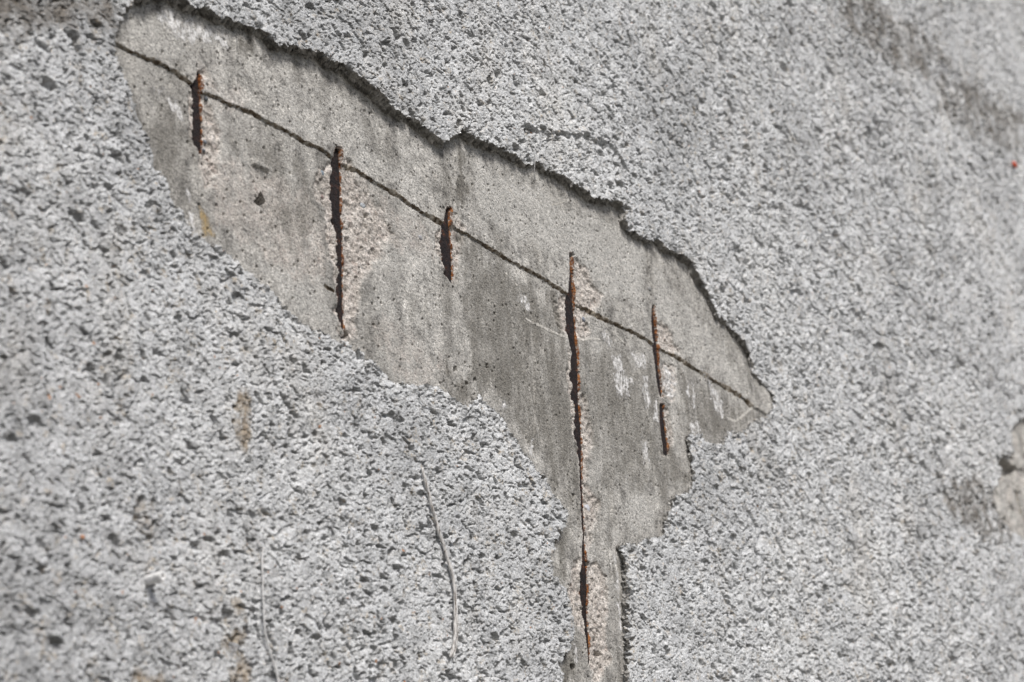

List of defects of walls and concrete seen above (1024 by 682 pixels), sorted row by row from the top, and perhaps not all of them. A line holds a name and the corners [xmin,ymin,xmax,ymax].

rust [190,73,204,166]
rust [329,148,346,339]
crack [115,42,754,408]
peeling [114,0,775,682]
rust [438,207,454,284]
rust [564,254,591,664]
rust [651,306,669,456]